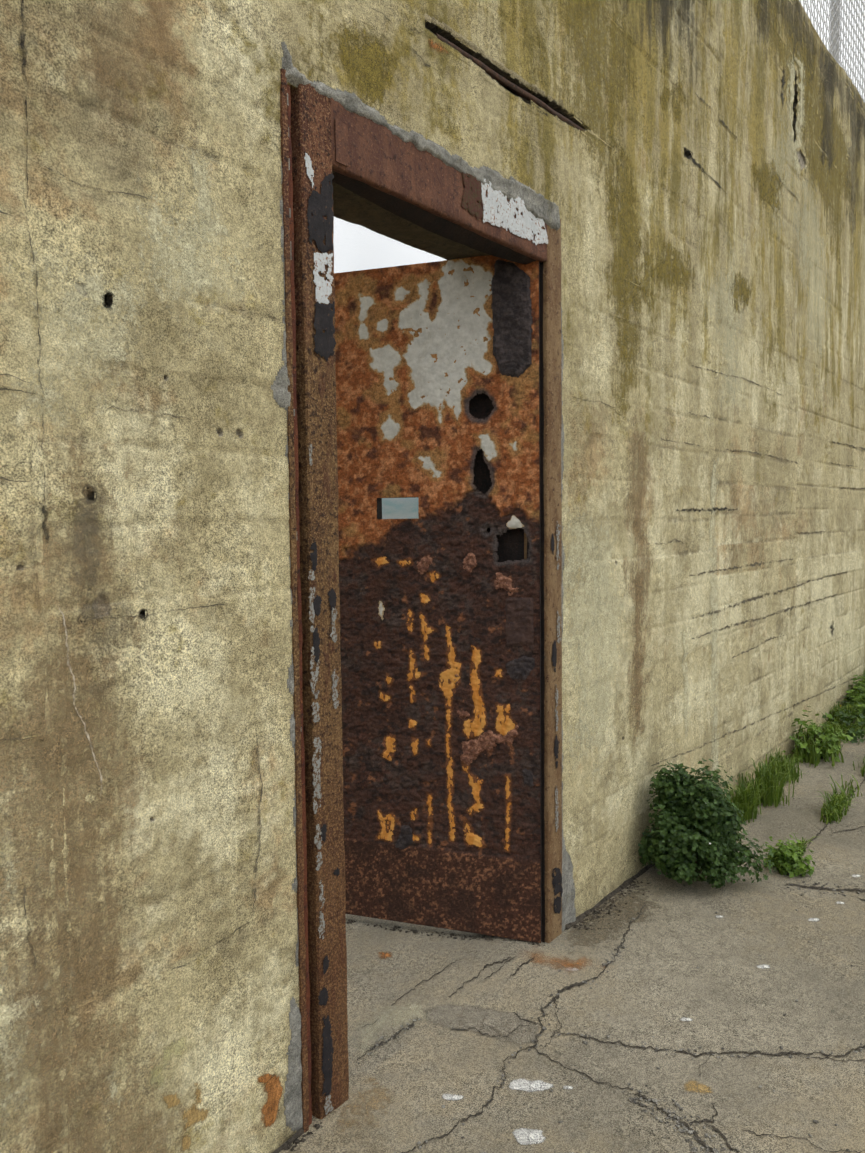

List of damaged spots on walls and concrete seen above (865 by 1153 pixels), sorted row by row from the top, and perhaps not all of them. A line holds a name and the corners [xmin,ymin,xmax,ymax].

water stain [647,0,694,52]
water stain [757,0,865,170]
corrosion [258,1073,283,1127]